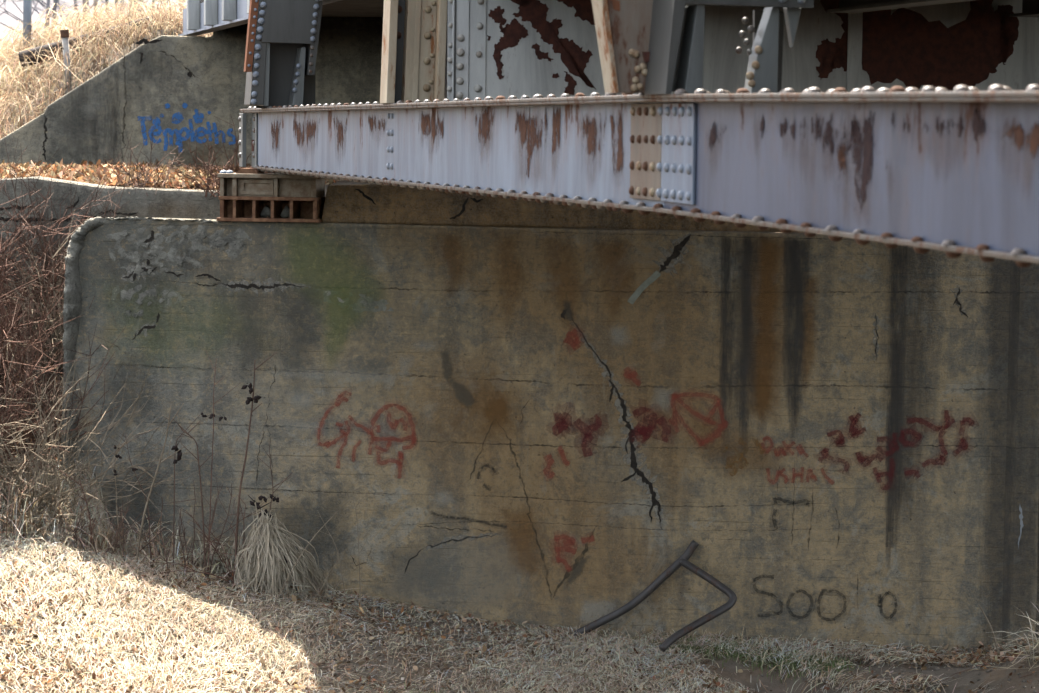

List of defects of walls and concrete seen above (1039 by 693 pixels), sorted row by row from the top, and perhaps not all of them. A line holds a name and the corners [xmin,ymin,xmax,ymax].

peeling [487,0,596,95]
peeling [816,0,848,79]
peeling [862,0,1019,92]
rust [418,109,443,144]
rust [515,107,561,178]
rust [581,111,624,174]
rust [778,111,875,212]
crack [0,198,312,294]
crack [653,233,691,278]
spalling [61,216,228,475]
crack [561,310,664,529]
crack [470,405,595,598]